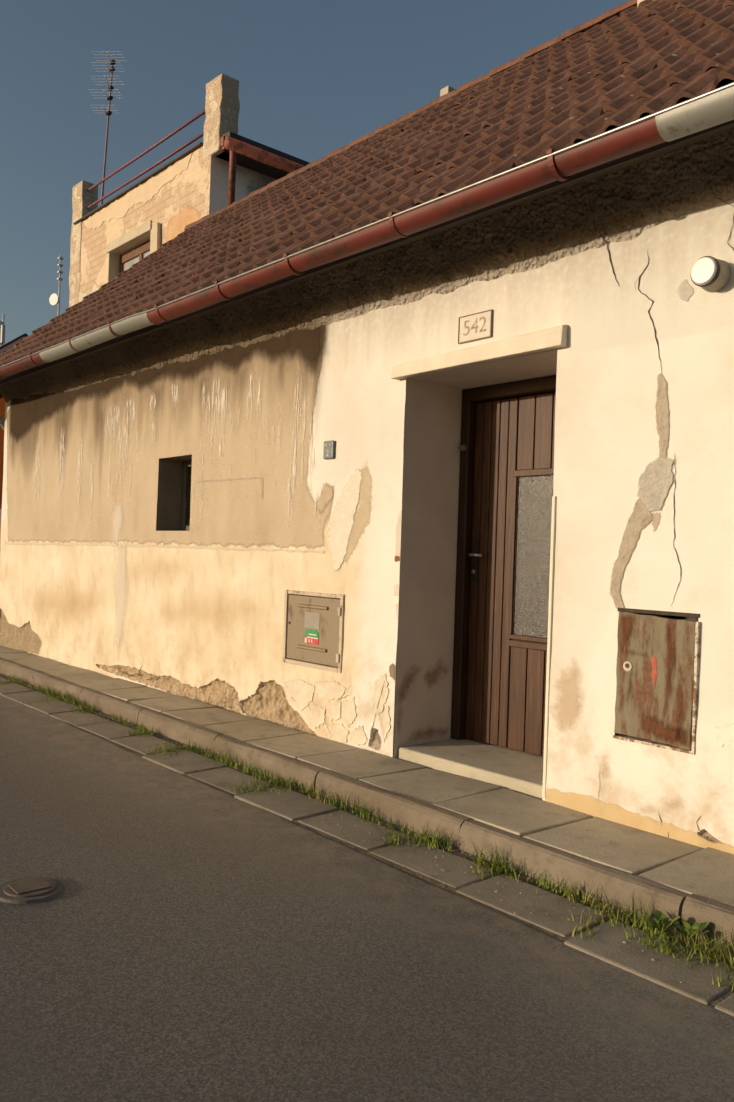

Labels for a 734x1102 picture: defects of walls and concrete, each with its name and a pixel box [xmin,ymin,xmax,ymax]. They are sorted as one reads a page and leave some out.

peeling [83,153,192,230]
flaking render [166,206,200,242]
crack [697,144,734,250]
crack [587,189,662,373]
leakage [10,325,325,460]
peeling [7,341,372,571]
crack [670,456,681,607]
spalling [0,608,42,654]
peeling [101,663,395,749]
rust [622,617,643,655]
rust [643,624,687,745]